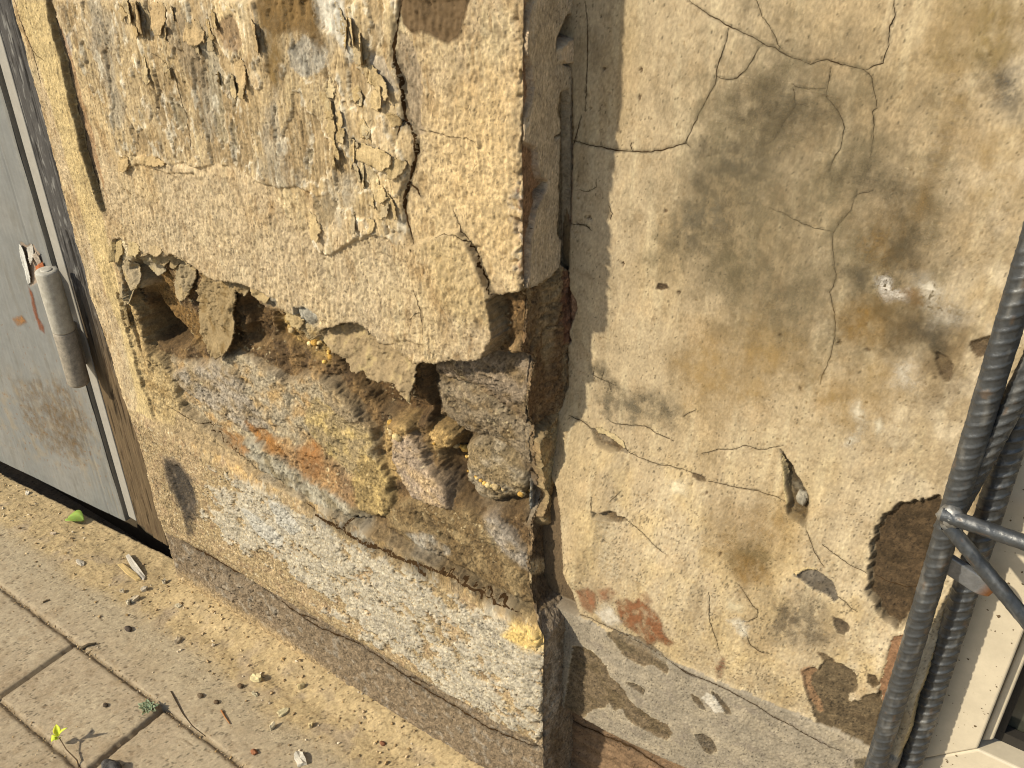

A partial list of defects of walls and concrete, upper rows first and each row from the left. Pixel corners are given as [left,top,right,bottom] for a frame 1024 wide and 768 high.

spalling [107,0,578,745]
crack [392,4,493,297]
leakage [603,385,646,419]
rust [578,590,672,645]
crack [569,415,784,501]
crack [557,0,895,265]
spalling [779,453,809,522]
crack [771,190,873,378]
leakage [697,60,959,373]
crack [807,532,917,587]
spalling [803,494,942,745]